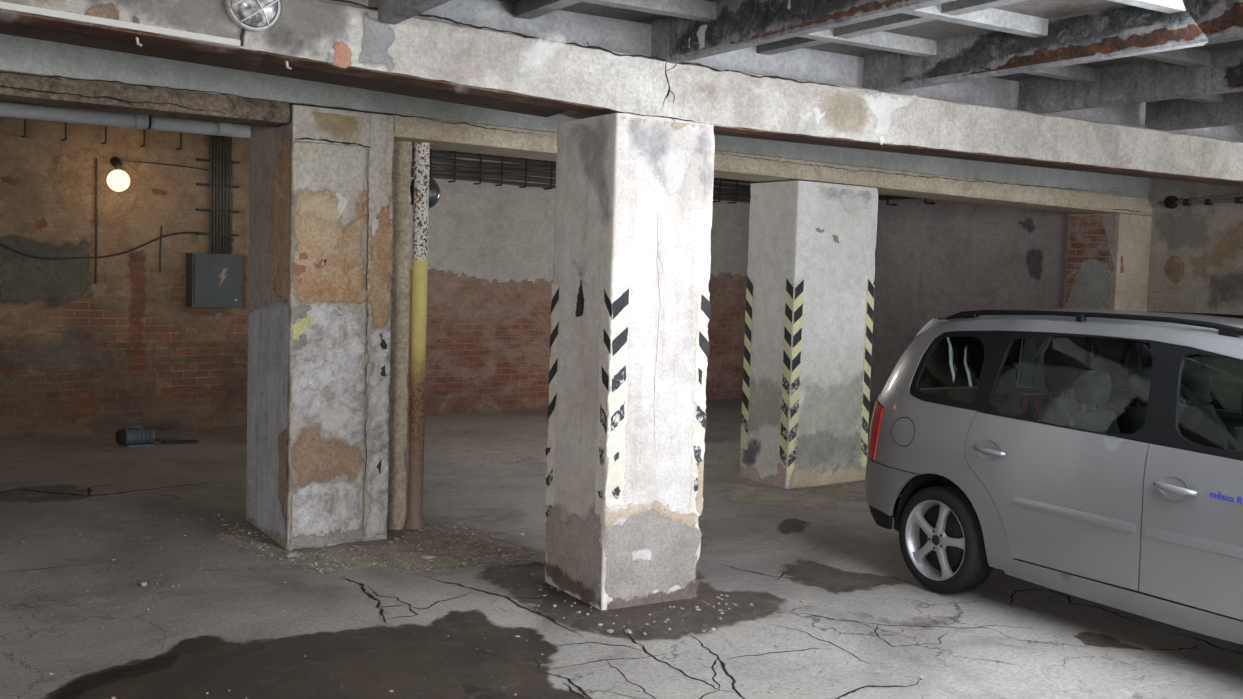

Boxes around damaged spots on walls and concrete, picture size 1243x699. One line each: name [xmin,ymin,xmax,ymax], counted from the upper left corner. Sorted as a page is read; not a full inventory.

crack [332,0,378,10]
rust [968,2,1243,75]
crack [416,14,1140,212]
spalling [1065,215,1124,308]
peeling [246,132,393,539]
water stain [47,610,586,699]
spalling [546,459,704,609]
water stain [481,562,786,640]
crack [725,559,823,580]
crack [342,576,1243,699]